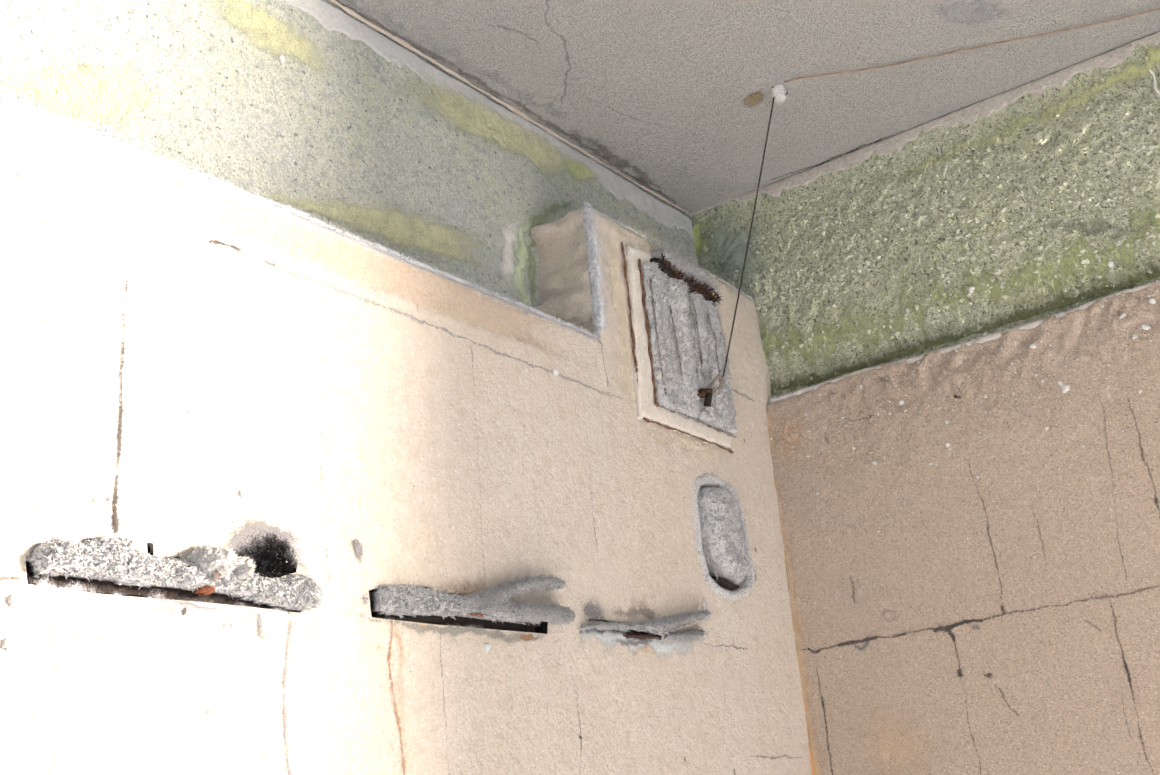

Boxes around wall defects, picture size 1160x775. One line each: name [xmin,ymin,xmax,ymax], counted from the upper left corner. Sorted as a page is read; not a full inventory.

water stain [336,0,673,201]
crack [498,0,571,101]
crack [0,165,622,581]
corrosion [621,242,737,454]
water stain [762,209,1160,365]
crack [751,399,1160,775]
corrosion [388,622,406,775]